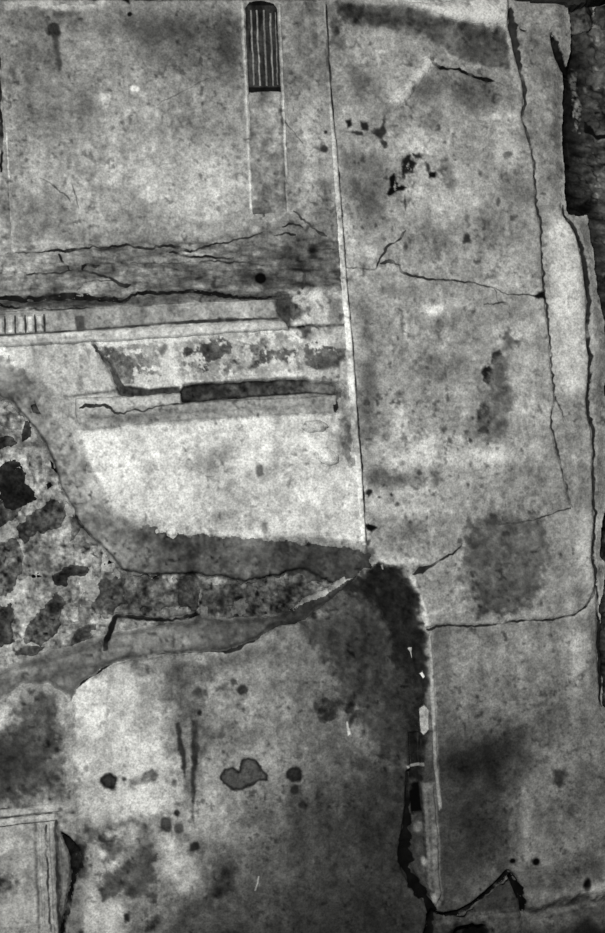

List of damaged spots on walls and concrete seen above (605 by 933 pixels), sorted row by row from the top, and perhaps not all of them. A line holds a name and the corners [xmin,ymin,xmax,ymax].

leakage [331,3,509,68]
crack [0,4,354,310]
flaking render [387,153,436,208]
crack [79,343,184,414]
peeling [100,344,167,384]
peeling [182,324,347,399]
crack [376,6,605,705]
spalling [0,396,333,669]
leakage [300,563,429,787]
leakage [100,770,158,789]
leakage [220,758,268,791]
crack [397,778,526,933]